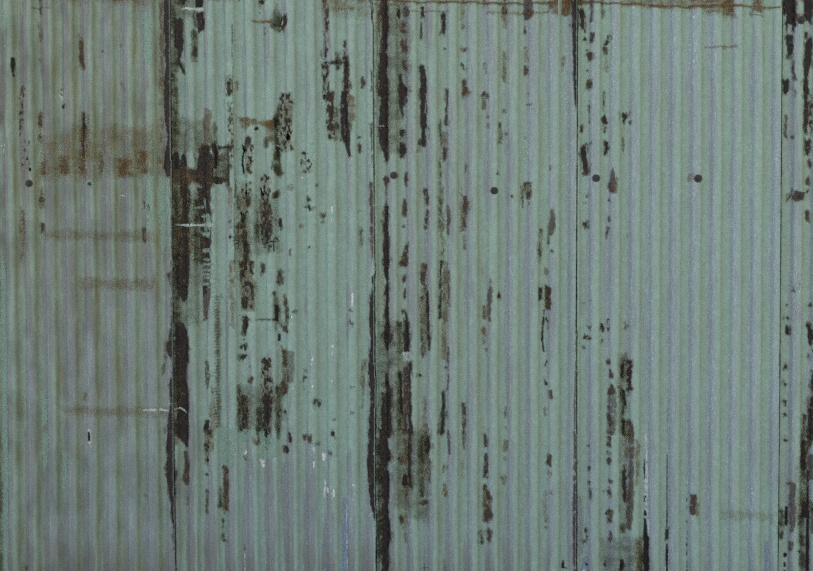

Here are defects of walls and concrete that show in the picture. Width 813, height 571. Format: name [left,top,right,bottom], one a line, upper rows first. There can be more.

corrosion [321,0,813,205]
corrosion [547,209,556,252]